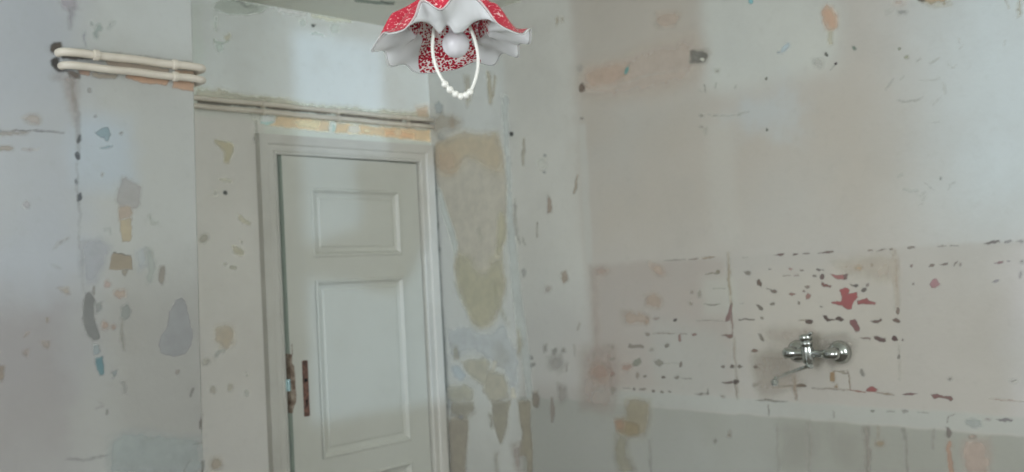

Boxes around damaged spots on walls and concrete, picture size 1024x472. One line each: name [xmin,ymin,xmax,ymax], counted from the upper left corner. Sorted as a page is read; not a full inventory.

peeling [82,287,117,376]
peeling [109,253,132,276]
peeling [159,298,193,356]
flaking render [261,116,507,327]
peeling [789,264,903,342]
flaking render [448,345,533,472]
flaking render [616,333,670,471]